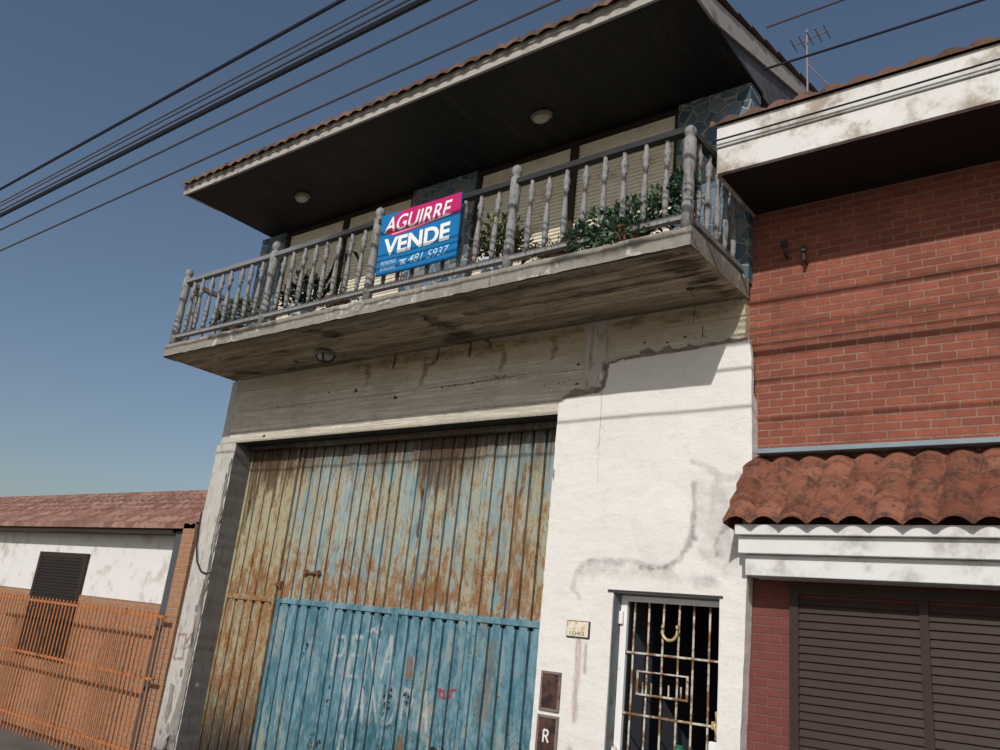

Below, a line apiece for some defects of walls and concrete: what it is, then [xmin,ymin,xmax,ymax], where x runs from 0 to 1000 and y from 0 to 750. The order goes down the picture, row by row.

water stain [382,253,734,381]
flaking render [560,336,748,402]
corrosion [242,449,295,526]
corrosion [417,436,470,536]